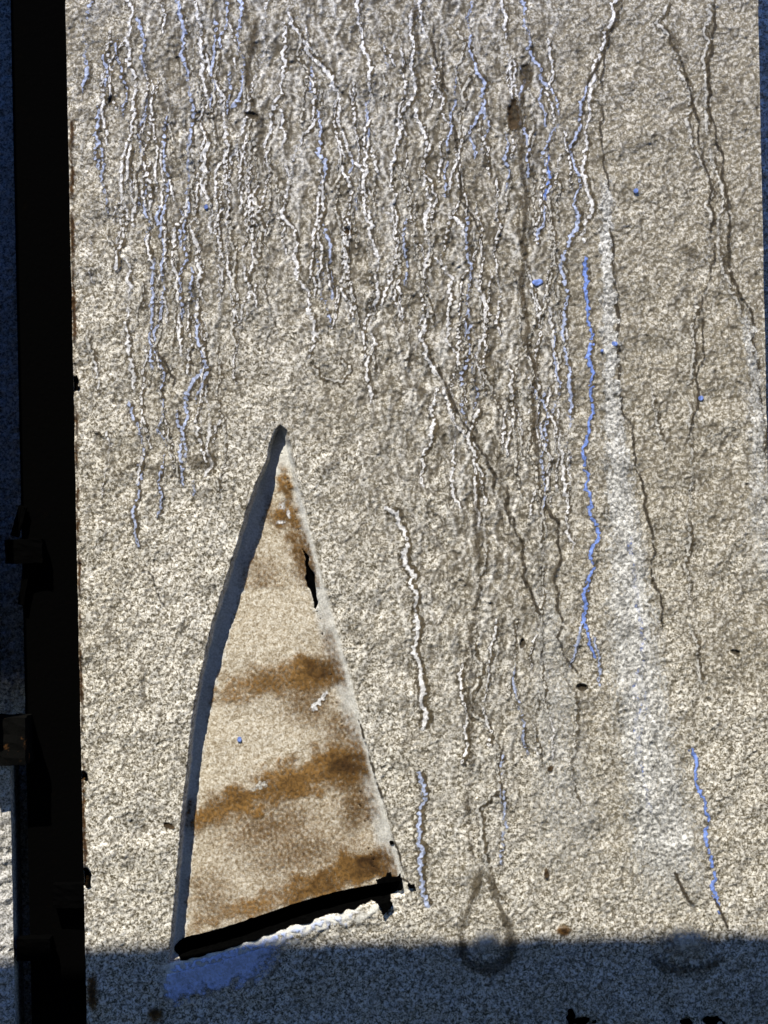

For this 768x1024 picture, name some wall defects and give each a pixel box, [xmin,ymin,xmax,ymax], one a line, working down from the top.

crack [666,4,768,458]
corrosion [267,468,319,587]
crack [302,549,318,609]
leakage [80,0,722,977]
corrosion [186,633,397,933]